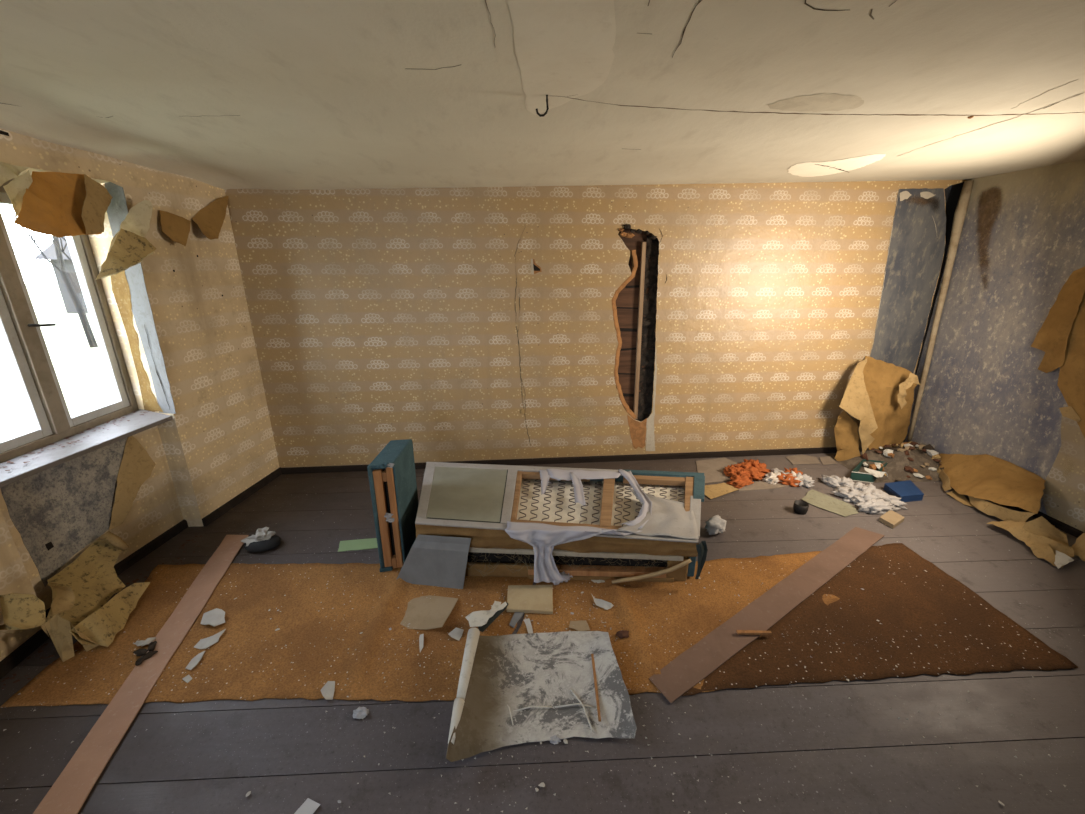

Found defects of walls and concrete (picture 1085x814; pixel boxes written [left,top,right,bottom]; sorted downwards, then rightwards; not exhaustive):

crack [672,0,702,58]
crack [804,0,897,19]
crack [559,93,1083,116]
flaking render [788,154,886,177]
spalling [612,224,659,451]
peeling [1,436,155,587]